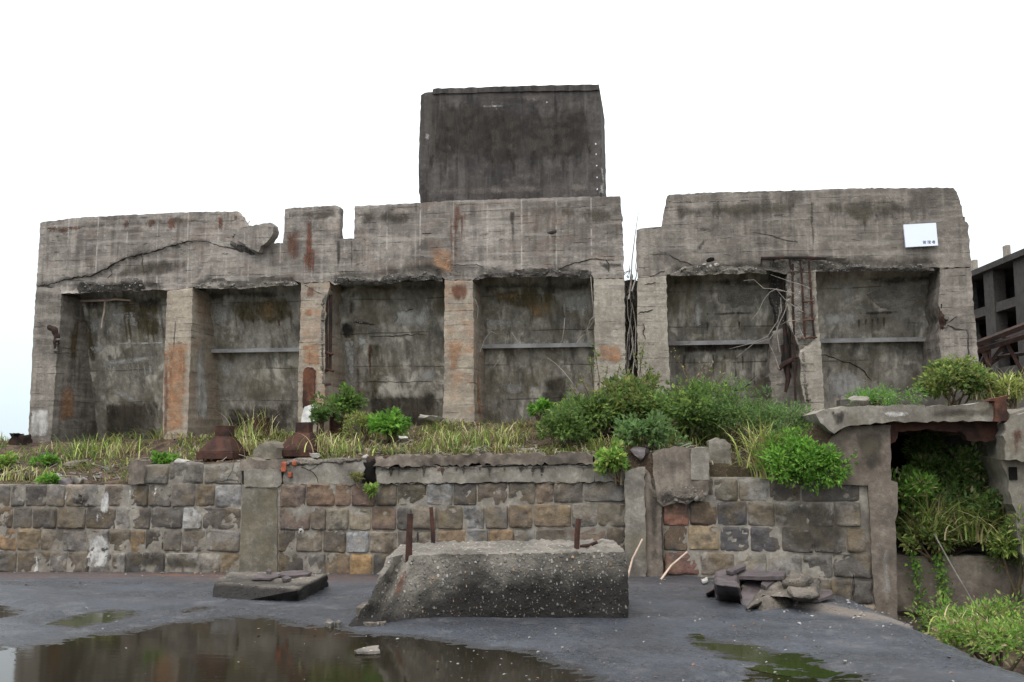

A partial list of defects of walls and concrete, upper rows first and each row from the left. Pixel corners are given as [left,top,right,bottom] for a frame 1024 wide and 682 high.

spalling [77,278,145,294]
crack [40,241,240,286]
corrosion [288,224,314,269]
spalling [475,269,593,280]
crack [558,258,609,272]
spalling [668,256,934,410]
crack [947,317,969,355]
crack [821,354,872,381]